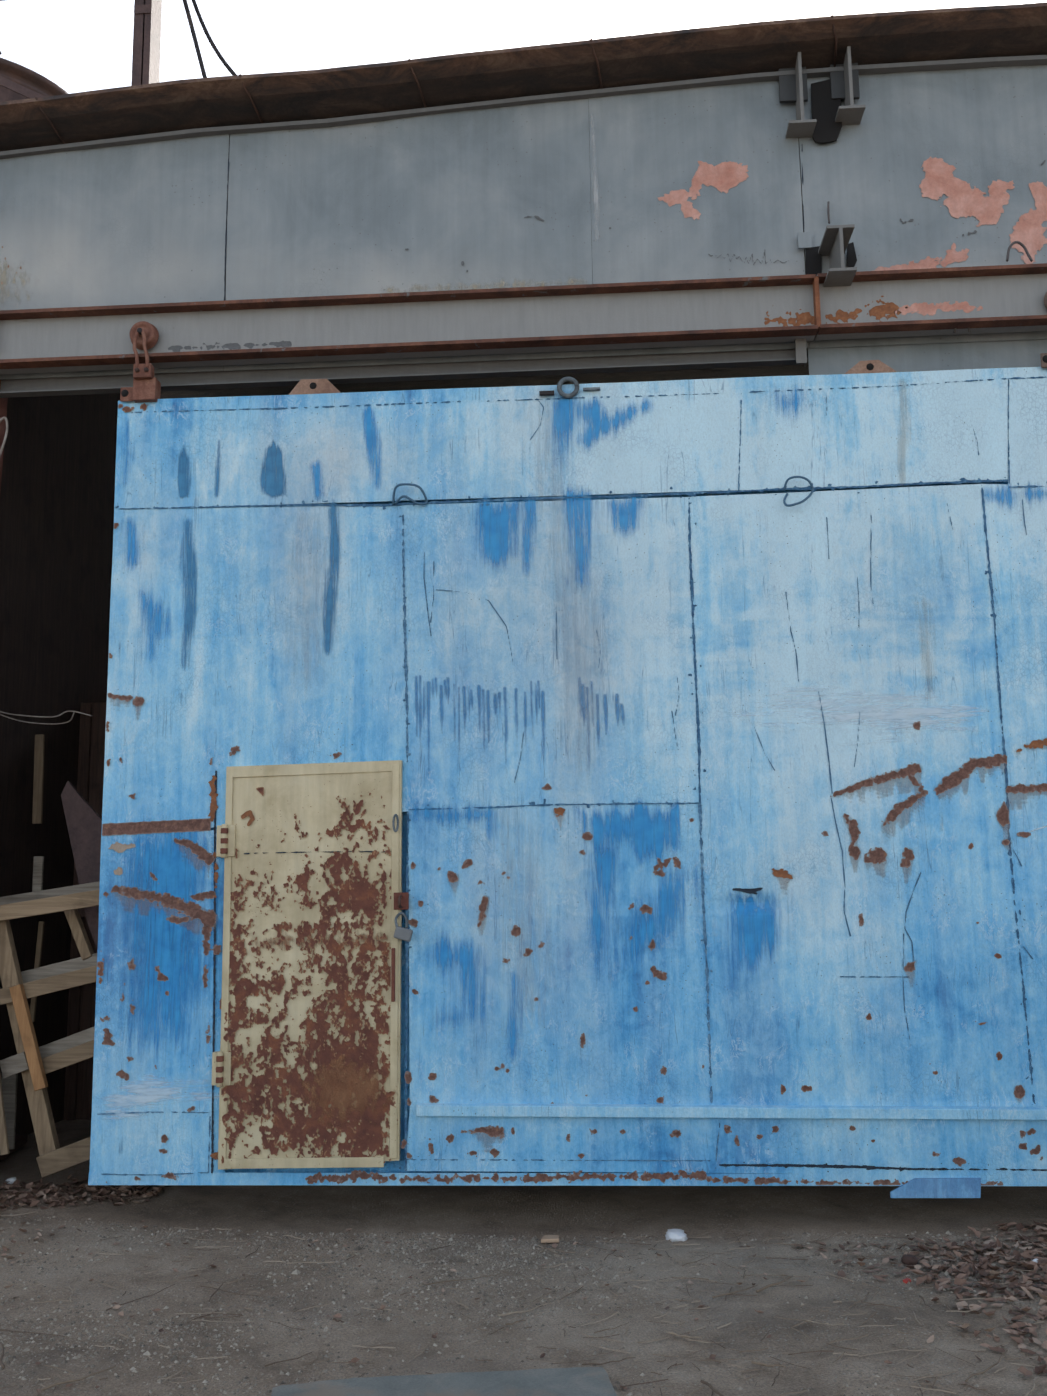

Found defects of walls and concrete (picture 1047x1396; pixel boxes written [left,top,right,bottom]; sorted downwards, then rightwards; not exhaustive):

peeling [658,161,749,220]
peeling [874,157,1047,271]
peeling [894,301,983,316]
rust [107,693,144,706]
rust [830,738,1047,826]
rust [996,783,1047,845]
rust [174,838,215,866]
rust [447,859,473,883]
rust [843,813,915,868]
rust [111,885,217,928]
rust [460,1125,505,1139]
rust [305,1169,908,1185]